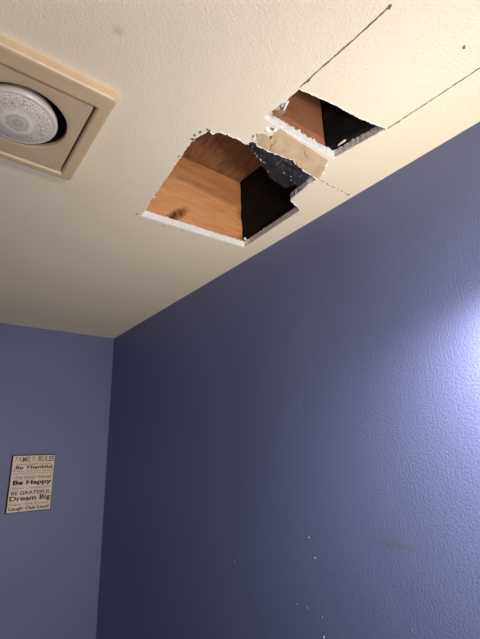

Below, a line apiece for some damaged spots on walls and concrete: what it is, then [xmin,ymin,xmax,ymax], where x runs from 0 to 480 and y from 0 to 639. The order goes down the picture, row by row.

crack [299,4,392,88]
crack [387,68,480,129]
peeling [248,127,328,180]